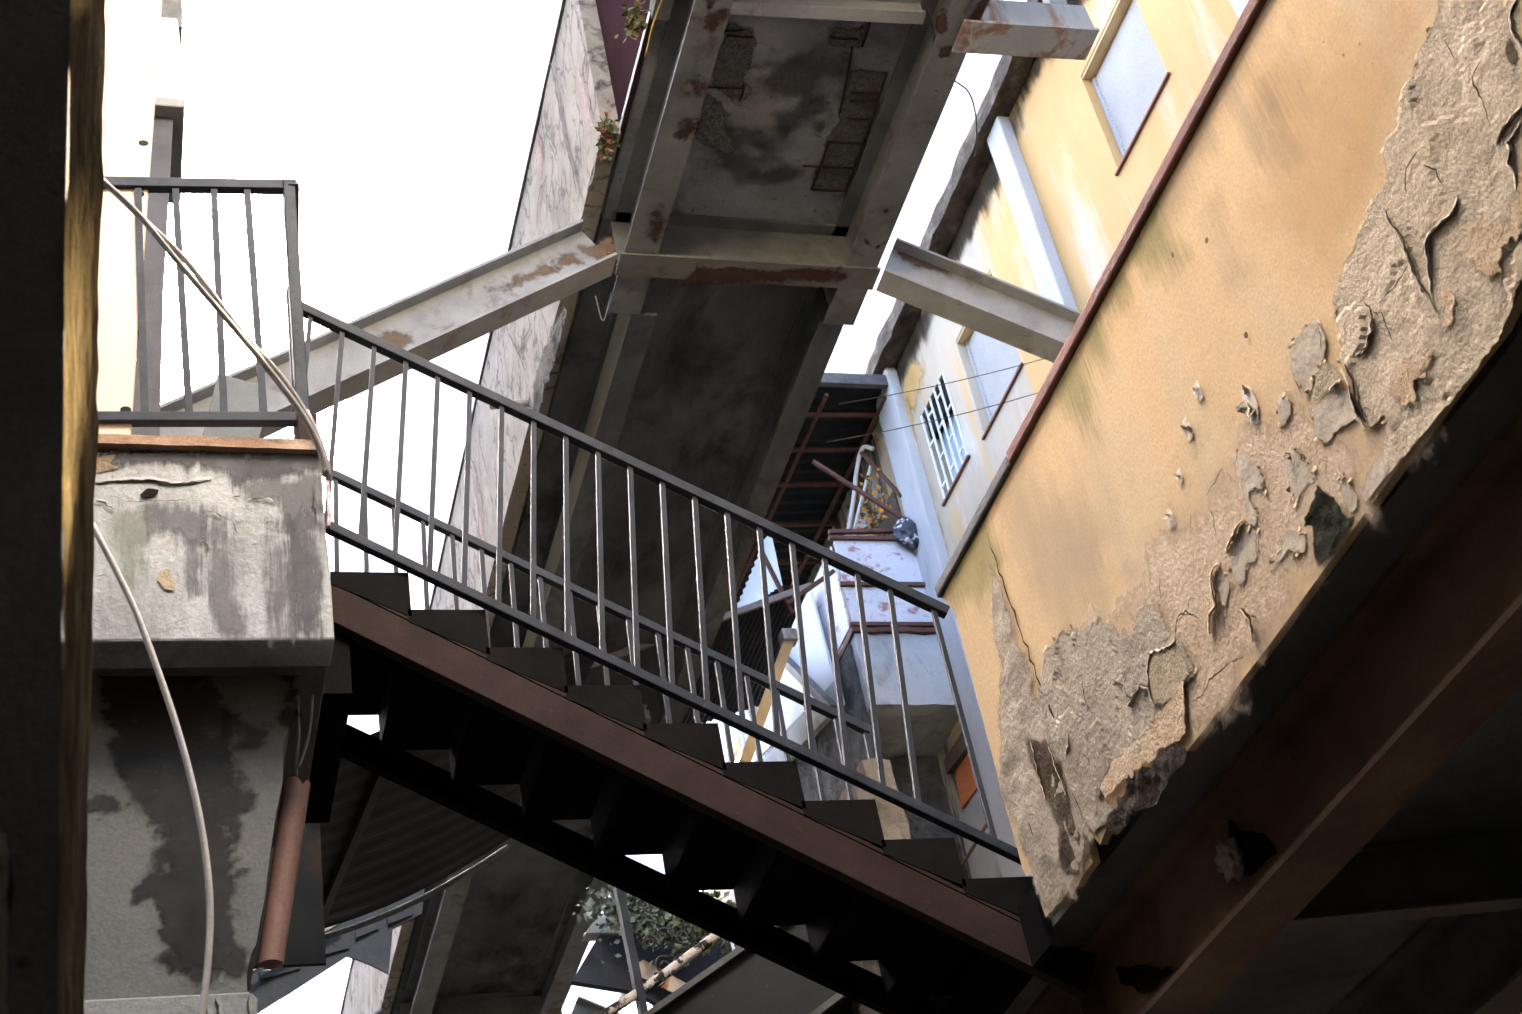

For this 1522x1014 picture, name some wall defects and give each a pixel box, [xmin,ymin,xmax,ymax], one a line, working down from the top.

corrosion [703,0,730,31]
corrosion [674,117,699,140]
corrosion [648,204,666,242]
corrosion [681,266,848,286]
corrosion [865,240,949,274]
peeling [990,0,1522,912]
damp [99,449,325,641]
damp [88,675,300,986]